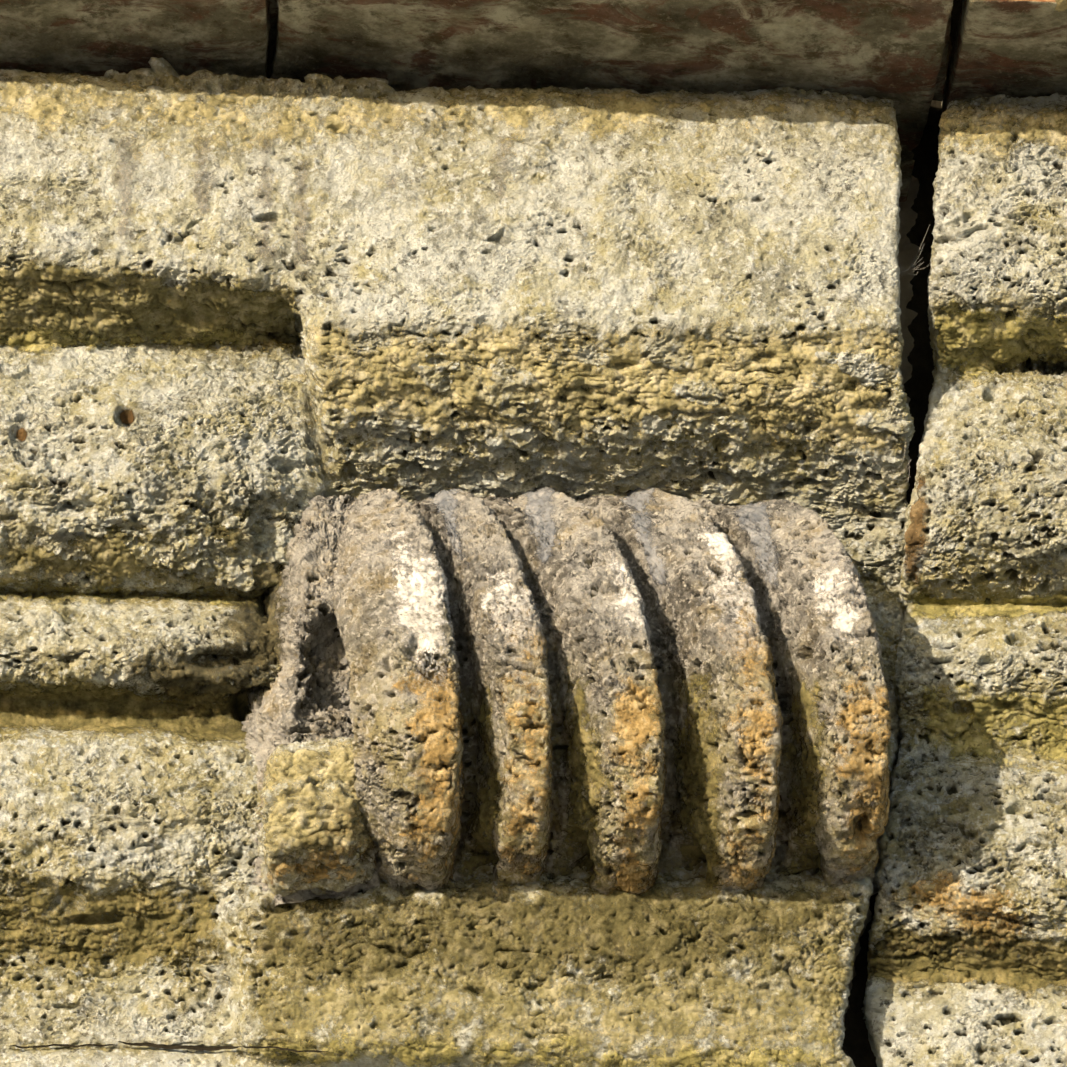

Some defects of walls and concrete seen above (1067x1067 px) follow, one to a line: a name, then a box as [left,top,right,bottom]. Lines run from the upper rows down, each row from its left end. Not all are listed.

crack [11,1041,327,1053]
crack [842,893,878,1067]